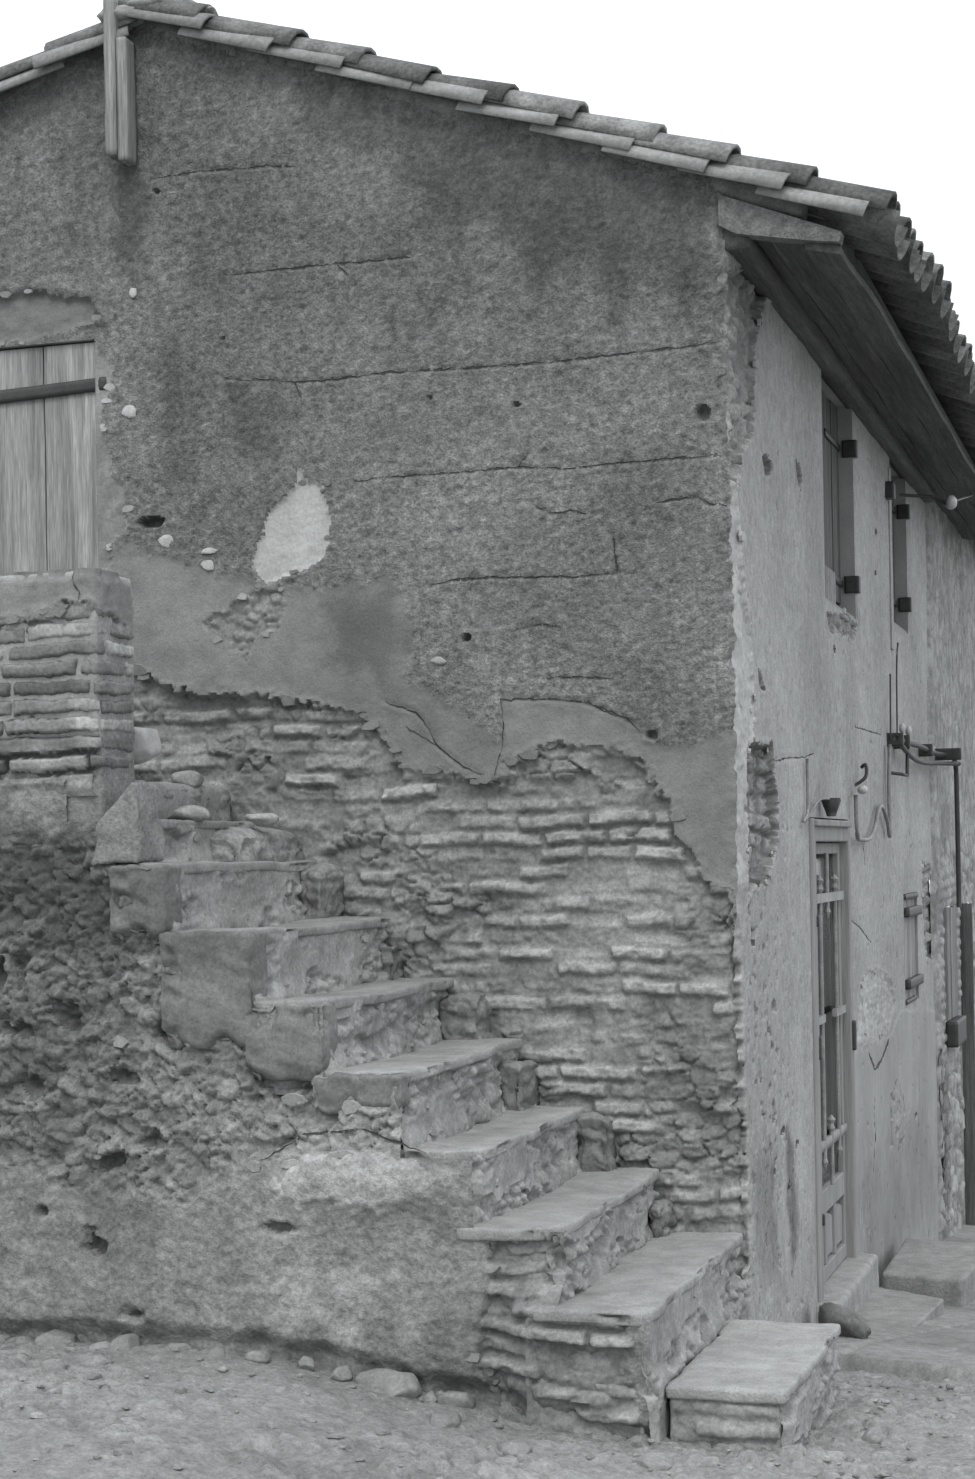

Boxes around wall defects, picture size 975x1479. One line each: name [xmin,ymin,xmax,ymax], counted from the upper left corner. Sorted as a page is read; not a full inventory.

crack [225,341,719,399]
crack [354,453,715,481]
crack [659,497,727,506]
crack [428,537,618,586]
spalling [0,257,780,1428]
peeling [857,967,896,1040]
crack [869,1039,889,1070]